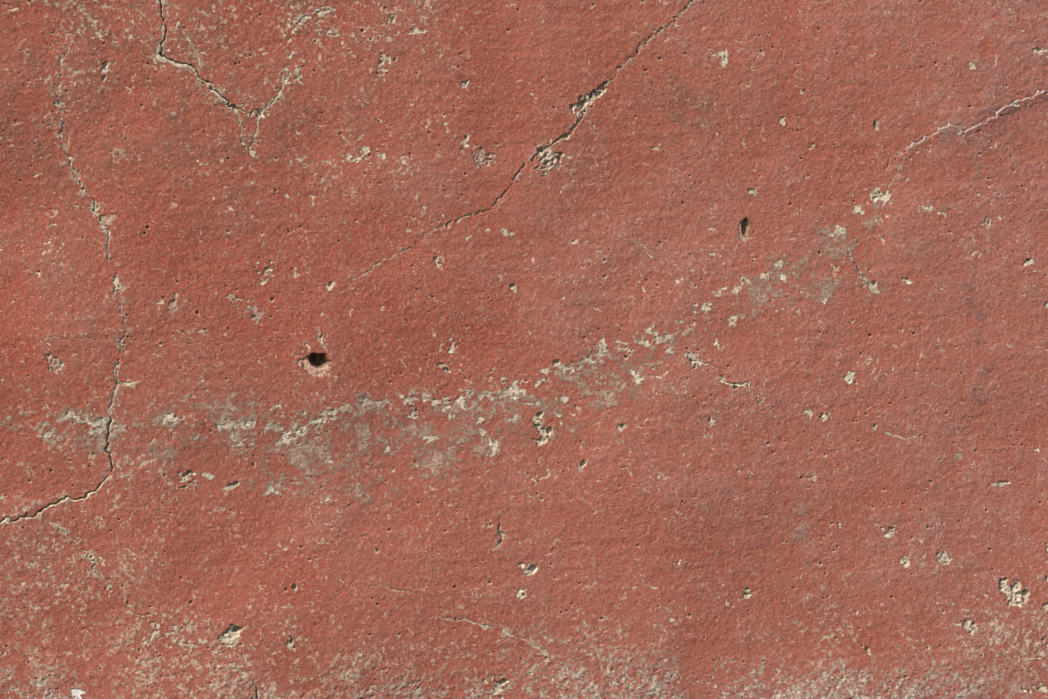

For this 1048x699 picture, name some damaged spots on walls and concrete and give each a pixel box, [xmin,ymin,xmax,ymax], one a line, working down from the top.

crack [155,0,343,203]
crack [514,0,695,178]
peeling [851,187,894,238]
crack [0,47,136,577]
flaking render [225,293,264,324]
peeling [693,224,884,327]
peeling [35,406,137,454]
peeling [148,320,691,503]
flaking render [844,371,857,385]
crack [129,605,258,699]